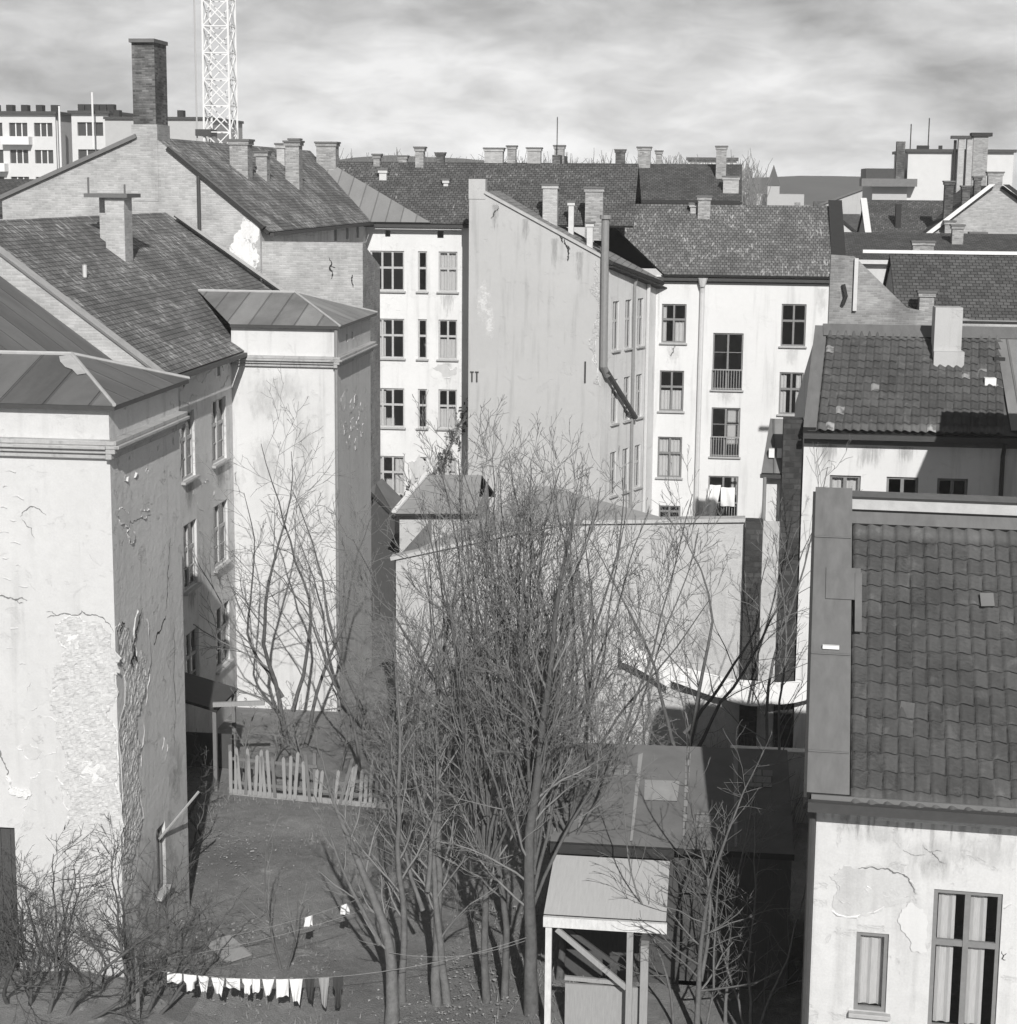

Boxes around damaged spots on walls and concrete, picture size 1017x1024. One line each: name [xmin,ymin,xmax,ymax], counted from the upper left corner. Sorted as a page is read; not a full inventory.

peeling [229,218,260,273]
crack [0,543,176,745]
spalling [6,609,151,905]
crack [861,846,947,893]